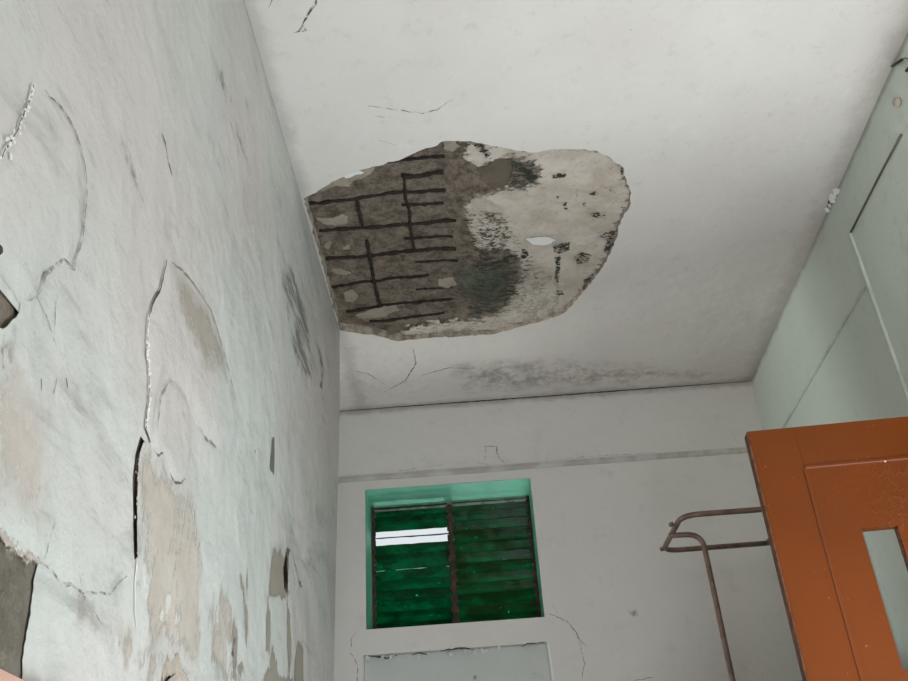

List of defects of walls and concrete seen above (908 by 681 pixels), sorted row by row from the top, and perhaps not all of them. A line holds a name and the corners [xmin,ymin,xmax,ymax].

crack [294,0,317,33]
spalling [304,141,631,341]
spalling [0,290,19,329]
crack [340,350,757,412]
crack [54,428,151,627]
peeling [0,528,40,679]
peeling [211,568,248,681]
peeling [263,547,304,681]